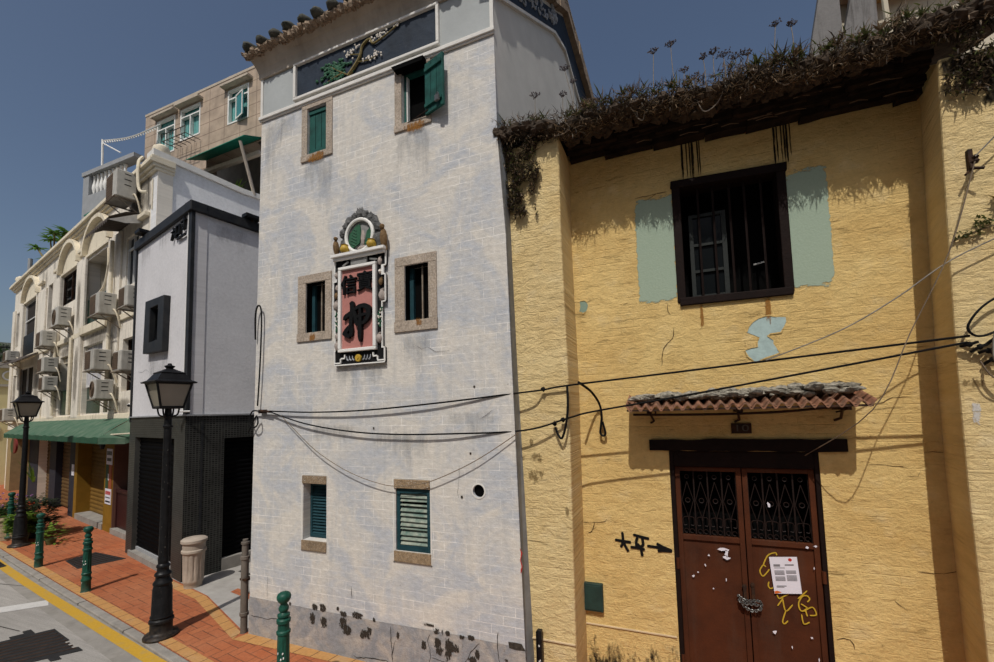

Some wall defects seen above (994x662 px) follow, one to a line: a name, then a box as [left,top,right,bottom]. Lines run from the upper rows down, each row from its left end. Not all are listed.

water stain [310,604,375,639]
water stain [421,623,480,662]